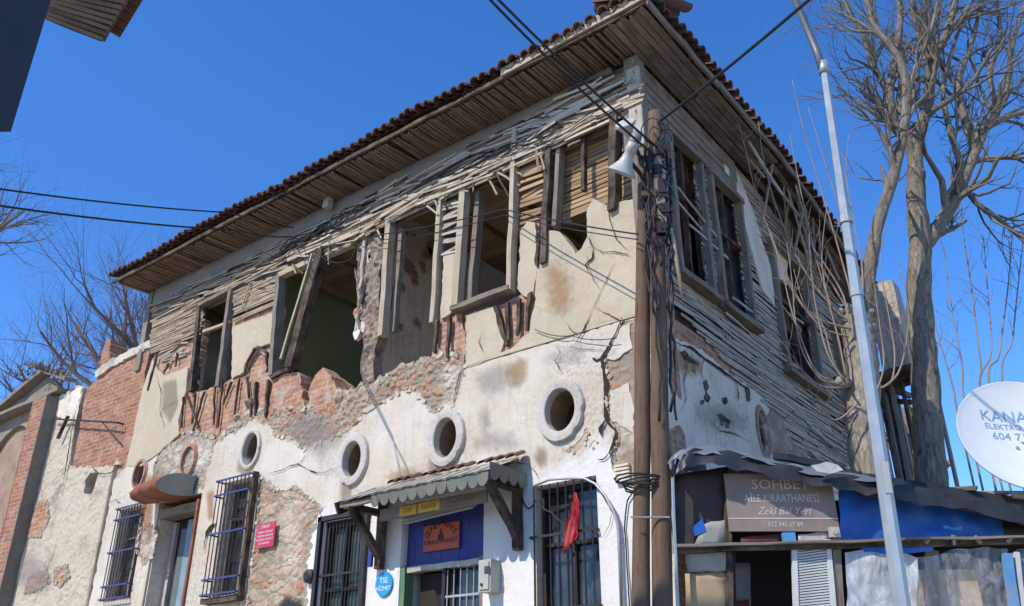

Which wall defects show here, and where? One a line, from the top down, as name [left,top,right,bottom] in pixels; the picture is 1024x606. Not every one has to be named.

flaking render [152,348,468,490]
damp [509,360,523,383]
crack [552,212,628,538]
spalling [680,350,731,429]
crack [274,456,332,473]
flaking render [27,499,51,539]
flaking render [23,563,70,594]
flaking render [243,474,324,606]